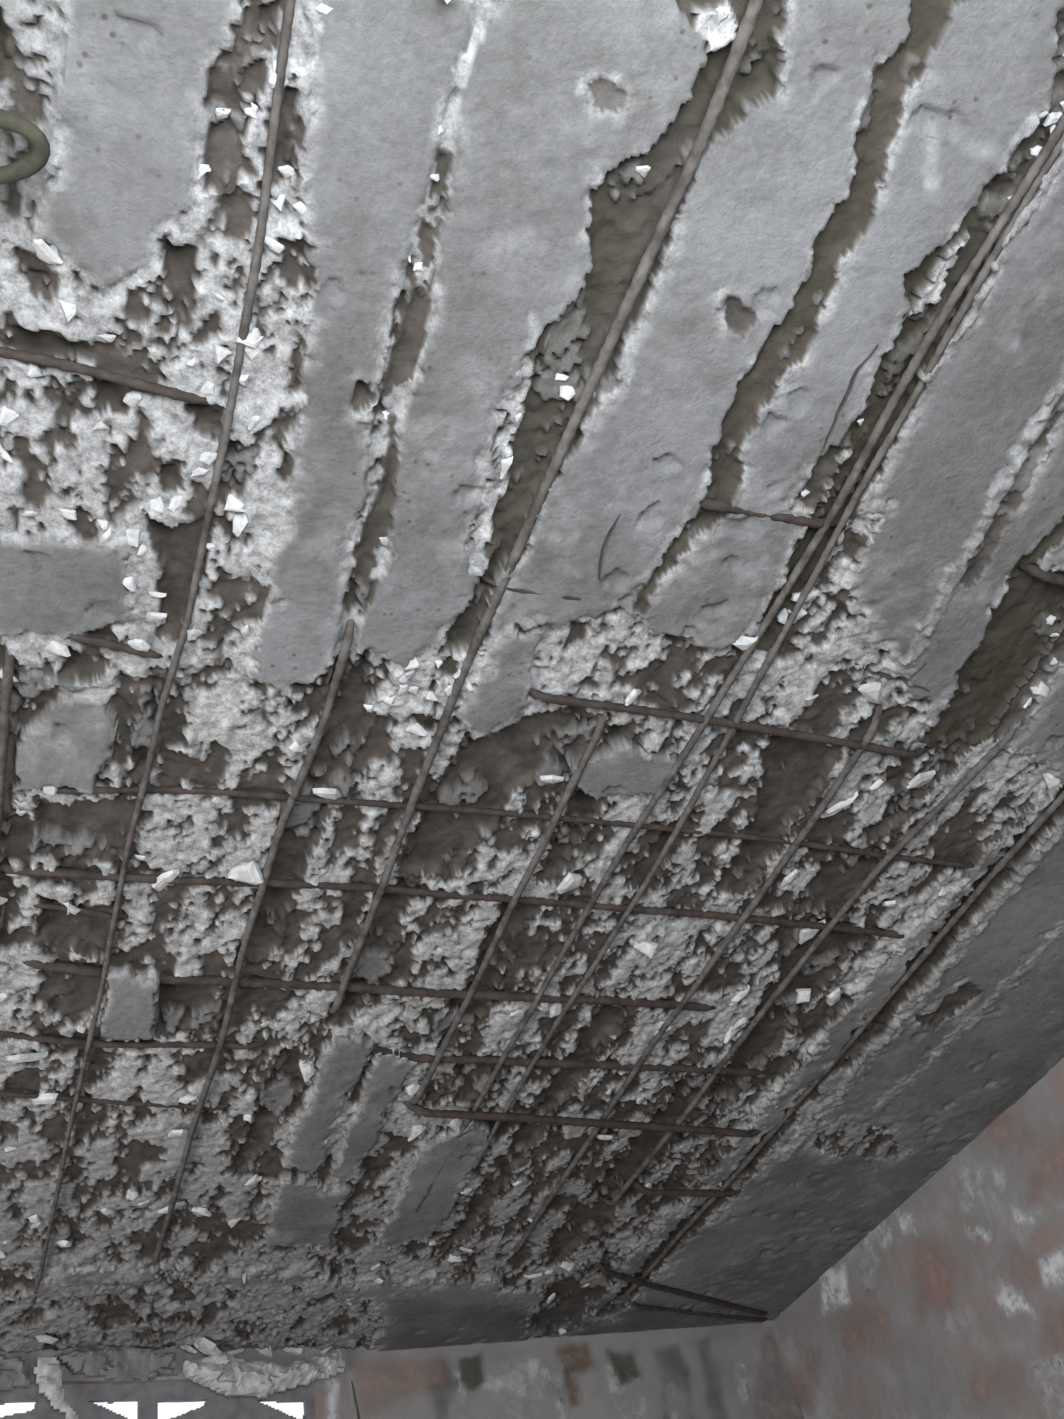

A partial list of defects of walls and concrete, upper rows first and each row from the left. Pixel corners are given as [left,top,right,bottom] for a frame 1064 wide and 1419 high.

spalling [675,0,789,218]
spalling [704,0,968,506]
spalling [790,10,1064,519]
spalling [0,0,749,1419]
spalling [477,153,1064,1191]